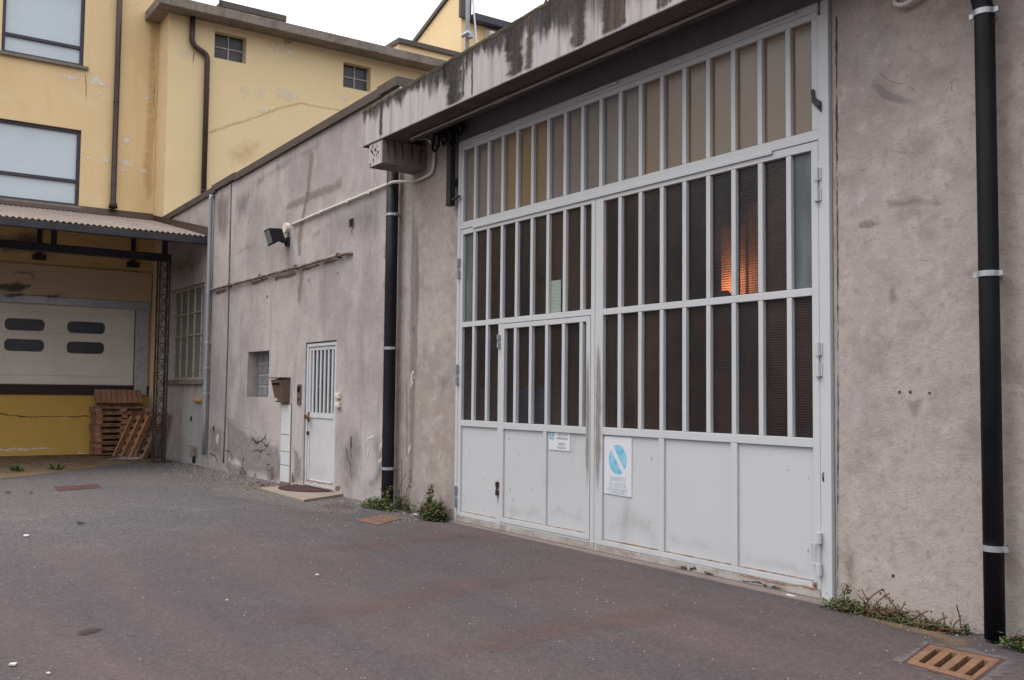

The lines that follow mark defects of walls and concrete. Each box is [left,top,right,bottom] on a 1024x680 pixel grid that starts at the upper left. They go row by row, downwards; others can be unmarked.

damp [363,0,626,162]
crack [210,418,279,477]
spalling [211,423,300,482]